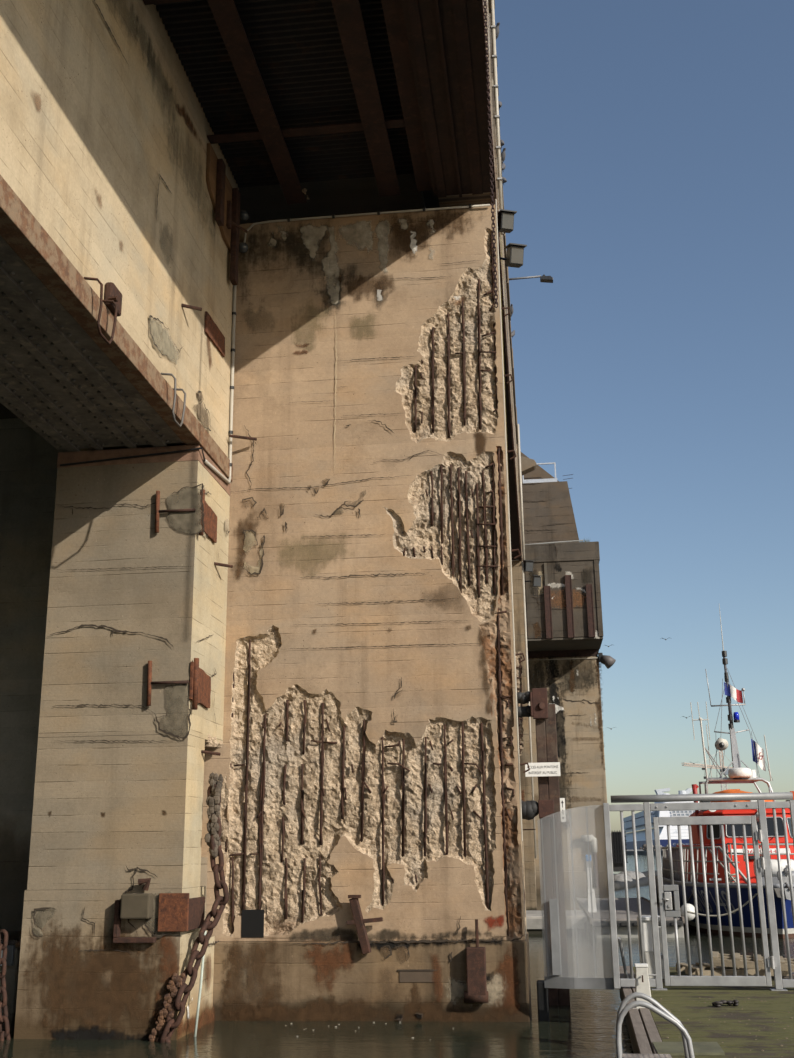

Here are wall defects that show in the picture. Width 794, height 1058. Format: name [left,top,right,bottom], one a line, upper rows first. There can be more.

water stain [238,209,466,311]
spalling [205,227,534,939]
water stain [528,655,598,829]
corrosion [25,923,215,1042]
corrosion [224,941,280,1021]
corrosion [306,943,352,990]
corrosion [485,915,504,928]
corrosion [486,954,520,1010]